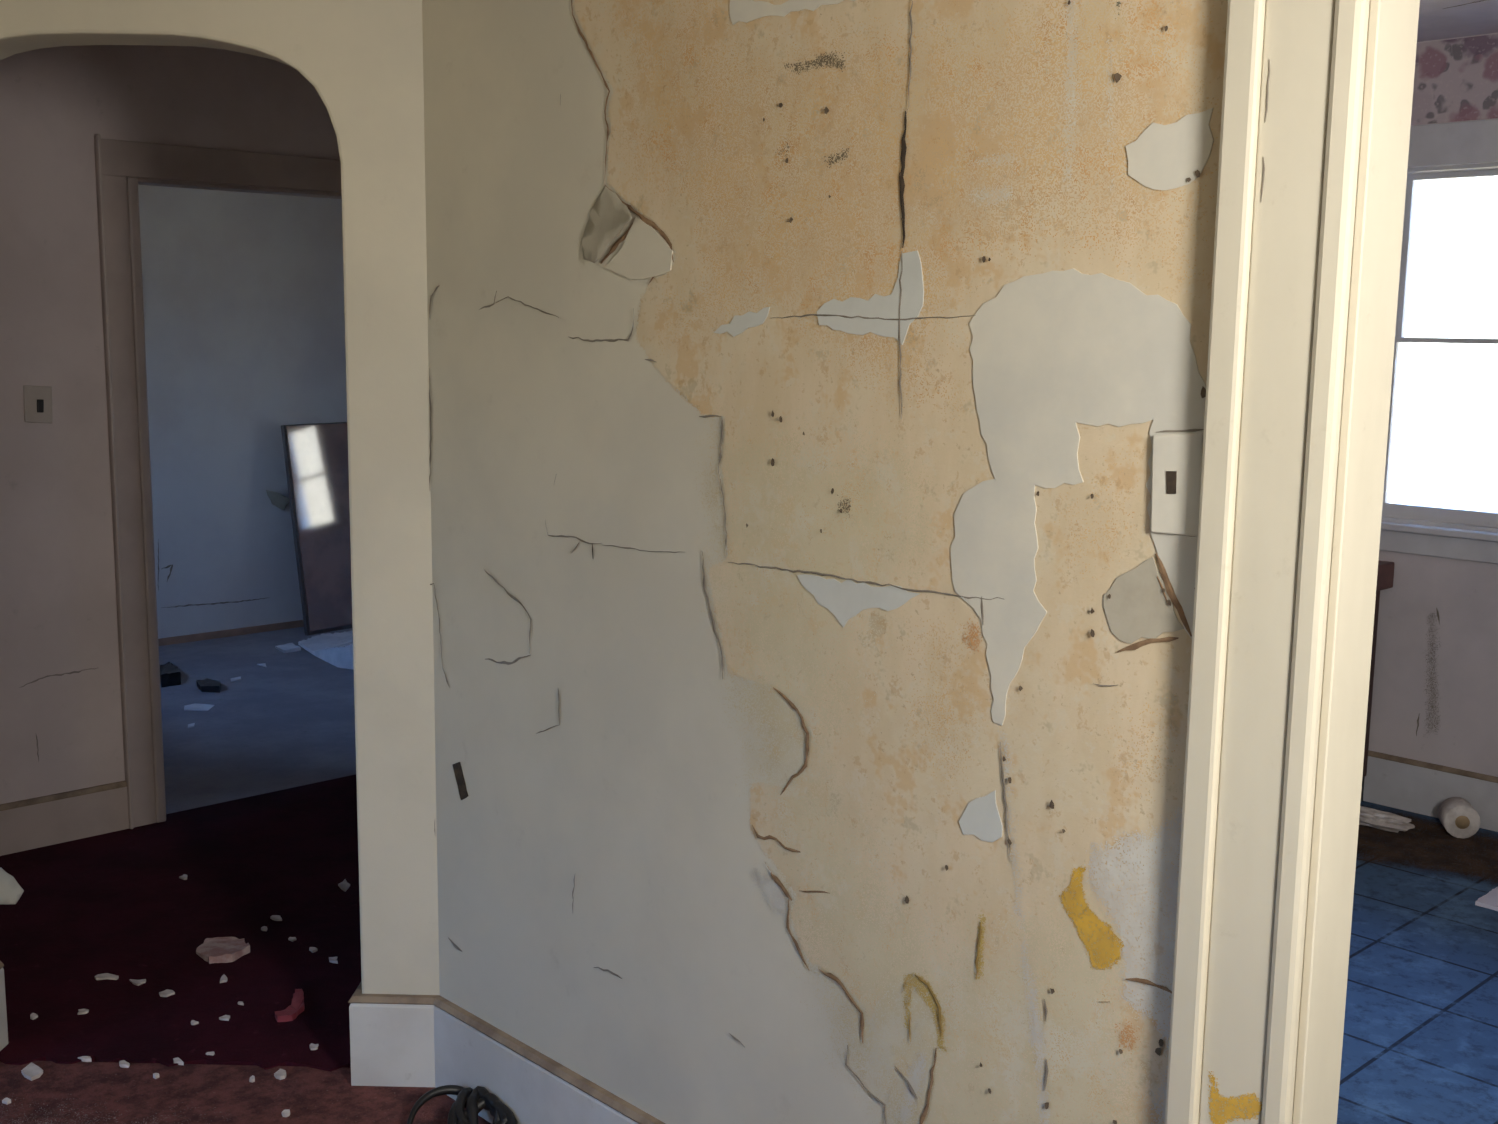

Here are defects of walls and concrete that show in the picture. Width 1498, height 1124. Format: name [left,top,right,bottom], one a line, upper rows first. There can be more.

crack [773,1,975,419]
crack [479,291,656,362]
crack [426,369,434,488]
crack [545,415,1003,679]
flaking render [573,0,1228,1124]
crack [430,583,450,688]
crack [485,571,532,665]
crack [536,690,560,734]
crack [773,687,809,795]
crack [1000,742,1012,862]
crack [1042,1059,1050,1090]